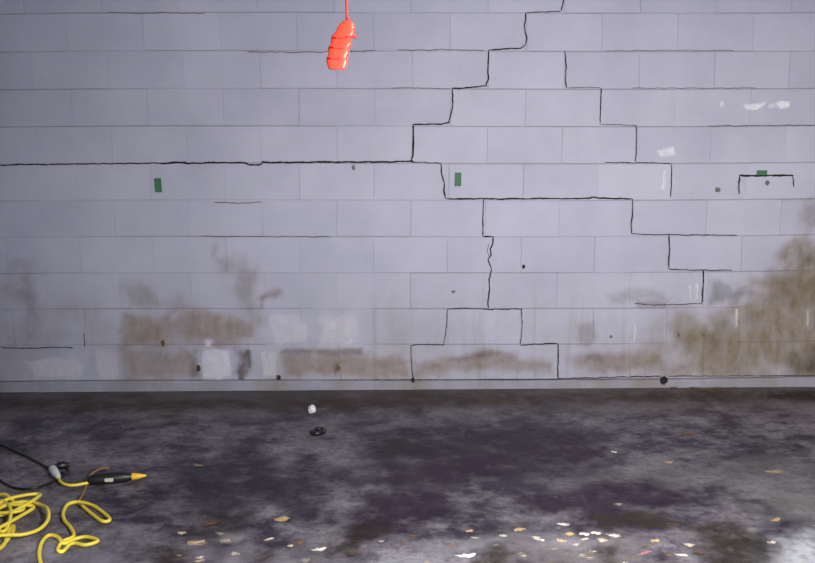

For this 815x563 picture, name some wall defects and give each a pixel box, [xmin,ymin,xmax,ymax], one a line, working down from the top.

crack [0,0,815,380]
water stain [687,256,815,377]